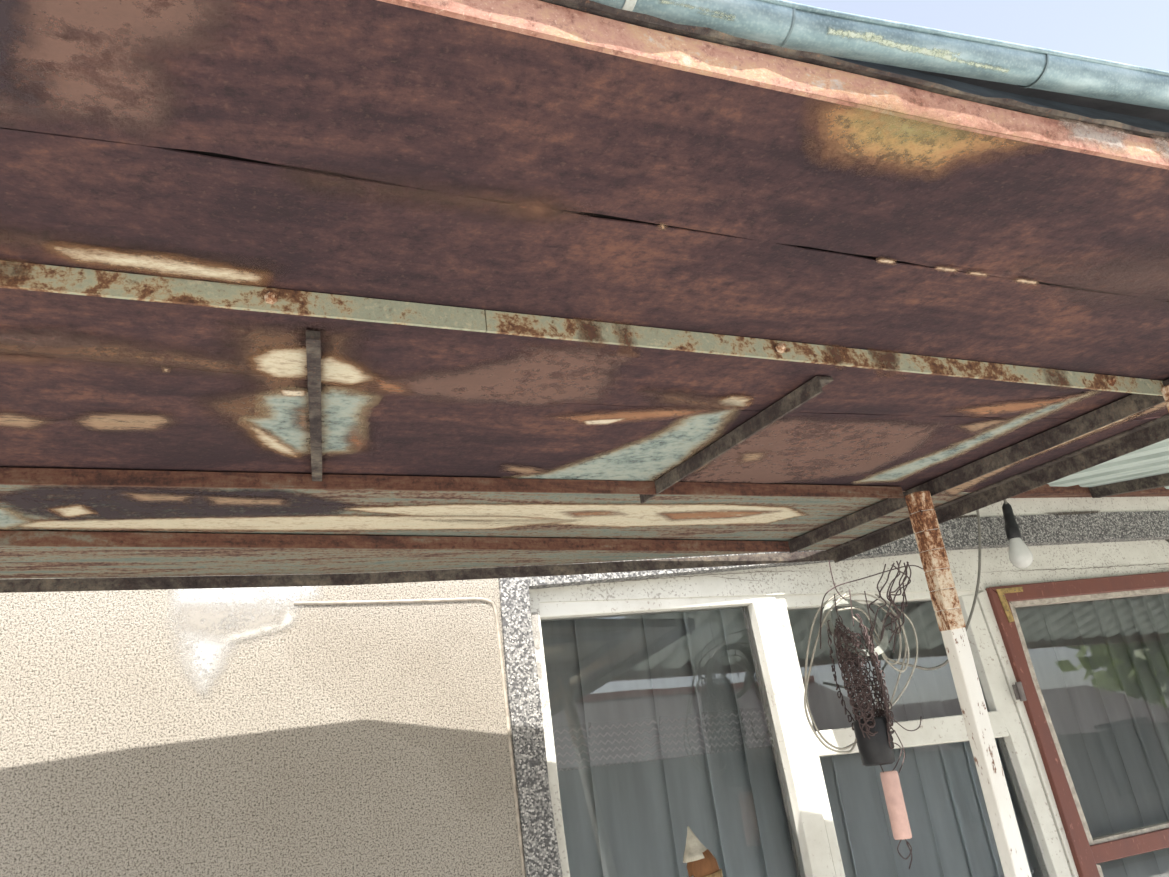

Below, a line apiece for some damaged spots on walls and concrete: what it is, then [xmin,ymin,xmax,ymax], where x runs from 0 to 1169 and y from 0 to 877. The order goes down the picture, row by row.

rust [0,0,231,129]
rust [819,101,1031,173]
rust [0,331,250,376]
peeling [206,326,378,457]
rust [370,318,637,406]
rust [869,348,898,376]
peeling [504,391,751,481]
peeling [0,504,805,531]